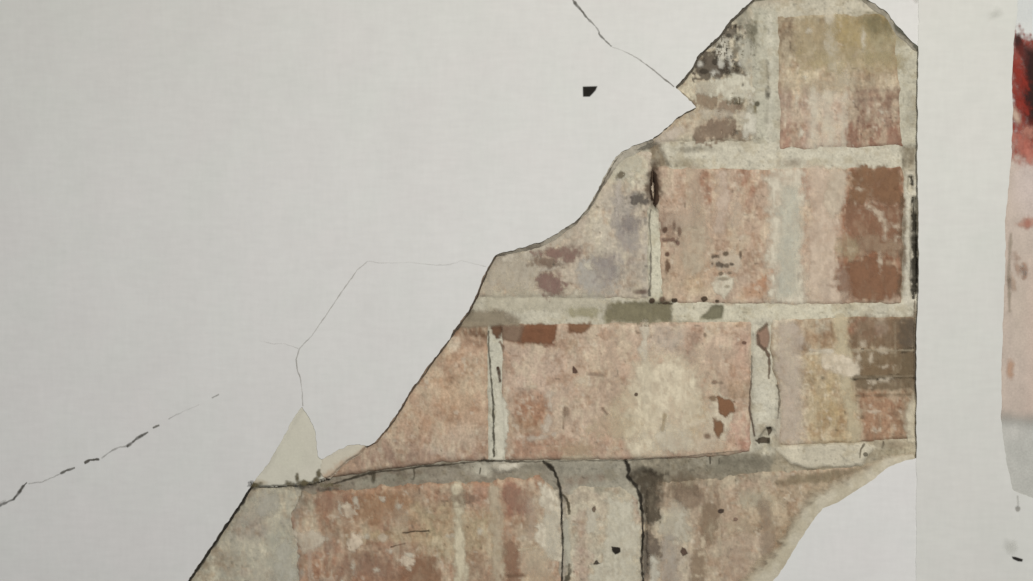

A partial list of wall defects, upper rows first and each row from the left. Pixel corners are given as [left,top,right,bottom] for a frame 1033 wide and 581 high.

crack [61,458,99,474]
crack [387,256,497,431]
crack [333,331,571,581]
flaking render [188,0,919,581]